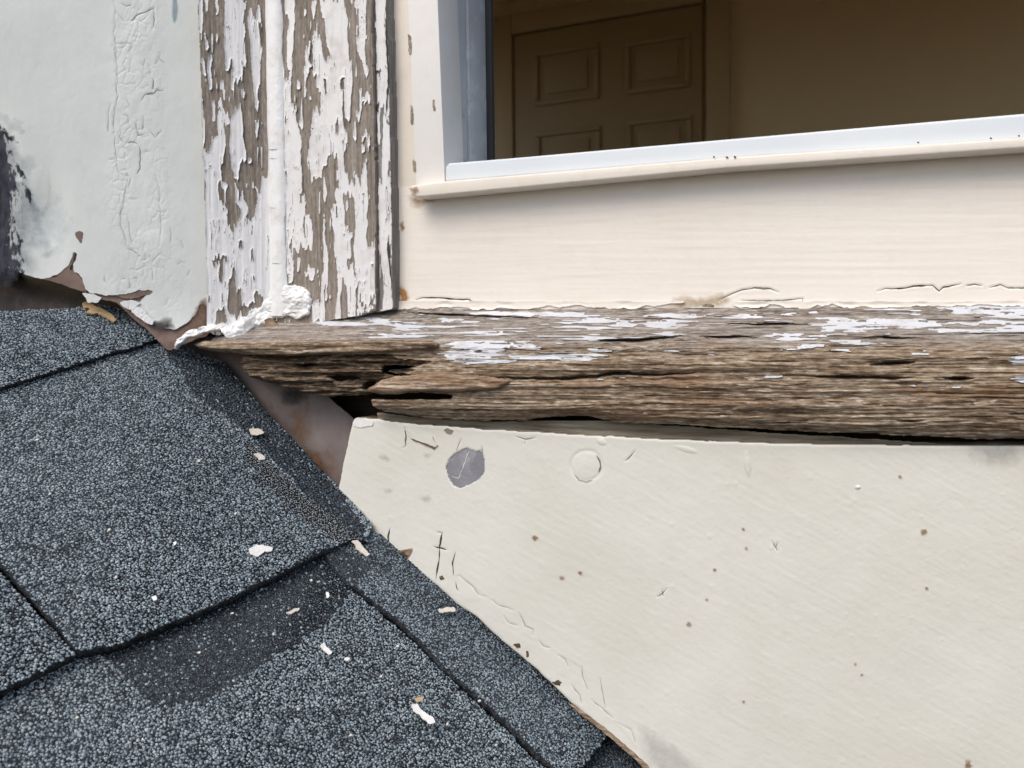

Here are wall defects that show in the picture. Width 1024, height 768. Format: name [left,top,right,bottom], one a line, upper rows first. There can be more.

crack [103,3,189,288]
peeling [198,0,270,335]
peeling [282,0,1024,365]
water stain [0,126,31,280]
peeling [44,231,101,303]
peeling [117,290,154,325]
crack [723,287,803,301]
crack [880,283,1024,291]
peeling [1008,355,1024,383]
peeling [353,418,373,428]
peeling [405,429,437,449]
peeling [446,448,485,488]